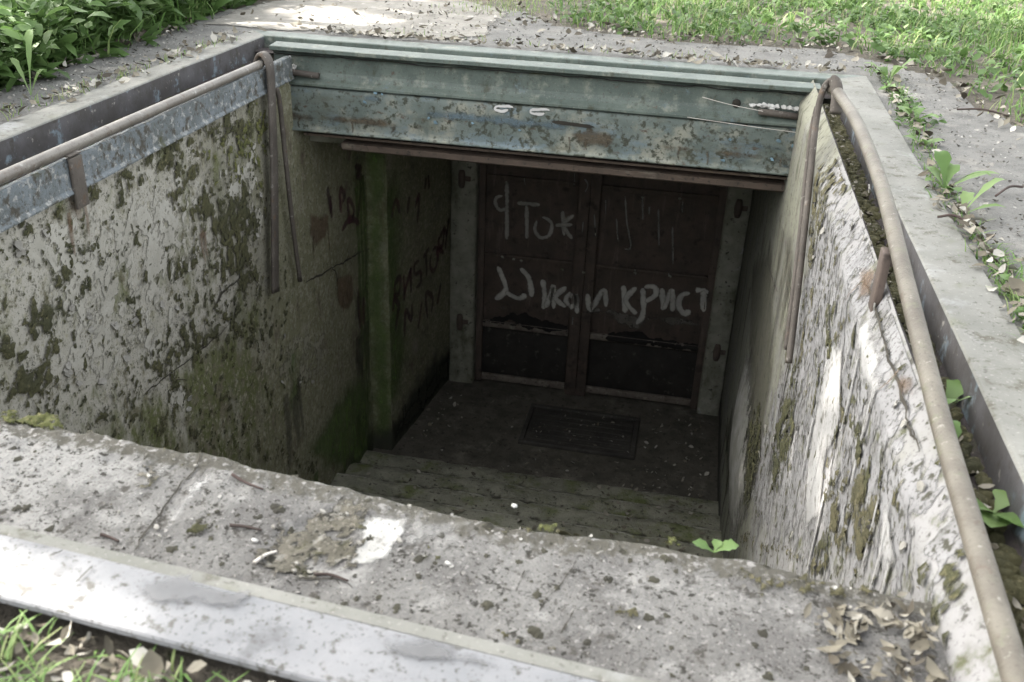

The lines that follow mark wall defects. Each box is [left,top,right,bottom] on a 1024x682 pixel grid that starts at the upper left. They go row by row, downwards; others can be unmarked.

corrosion [568,129,612,149]
crack [306,249,369,283]
leakage [801,316,880,573]
leakage [859,495,894,593]